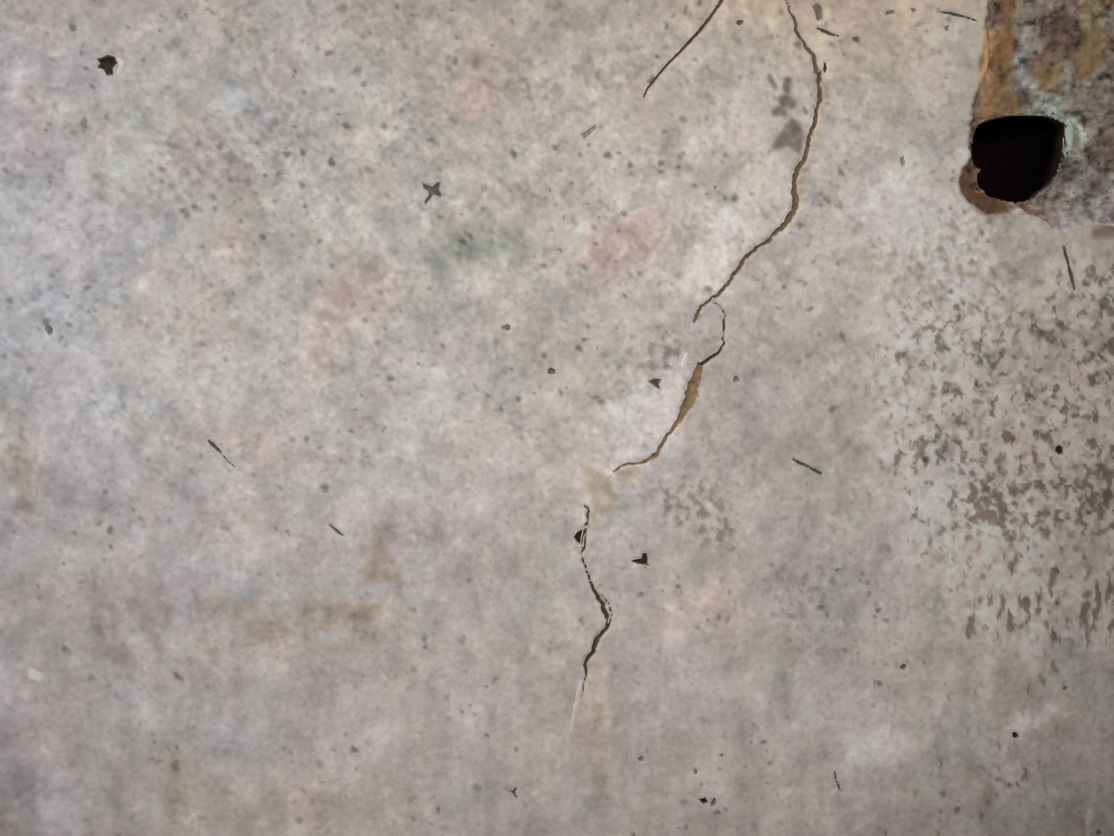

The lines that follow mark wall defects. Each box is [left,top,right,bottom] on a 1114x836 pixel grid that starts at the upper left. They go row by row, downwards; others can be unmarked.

spalling [883,7,918,16]
spalling [958,0,1114,232]
crack [613,0,827,474]
peeling [865,255,1114,691]
crack [570,504,614,733]